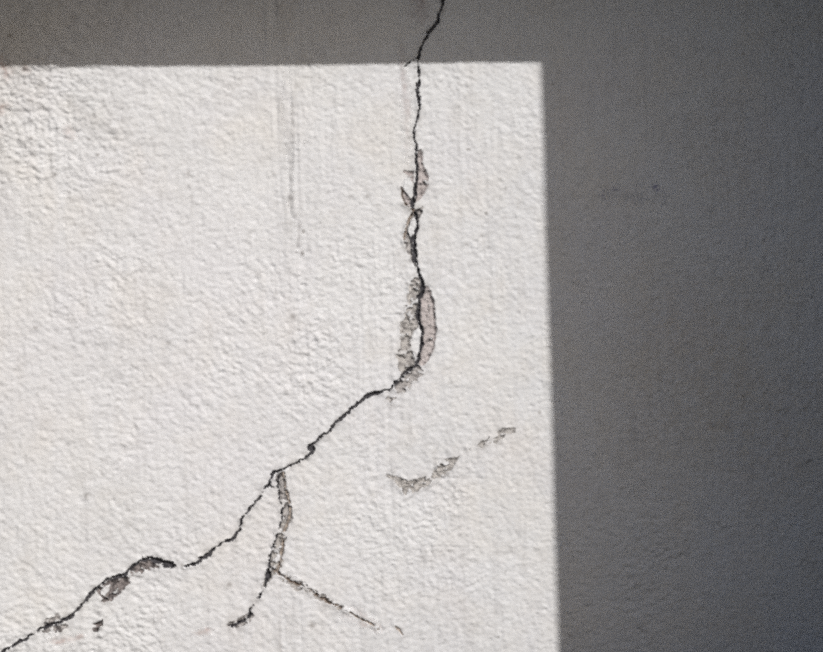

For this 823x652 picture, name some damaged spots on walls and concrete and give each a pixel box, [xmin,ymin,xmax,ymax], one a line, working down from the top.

crack [1,0,445,652]
peeling [386,149,437,406]
peeling [387,456,460,495]
peeling [469,428,516,450]